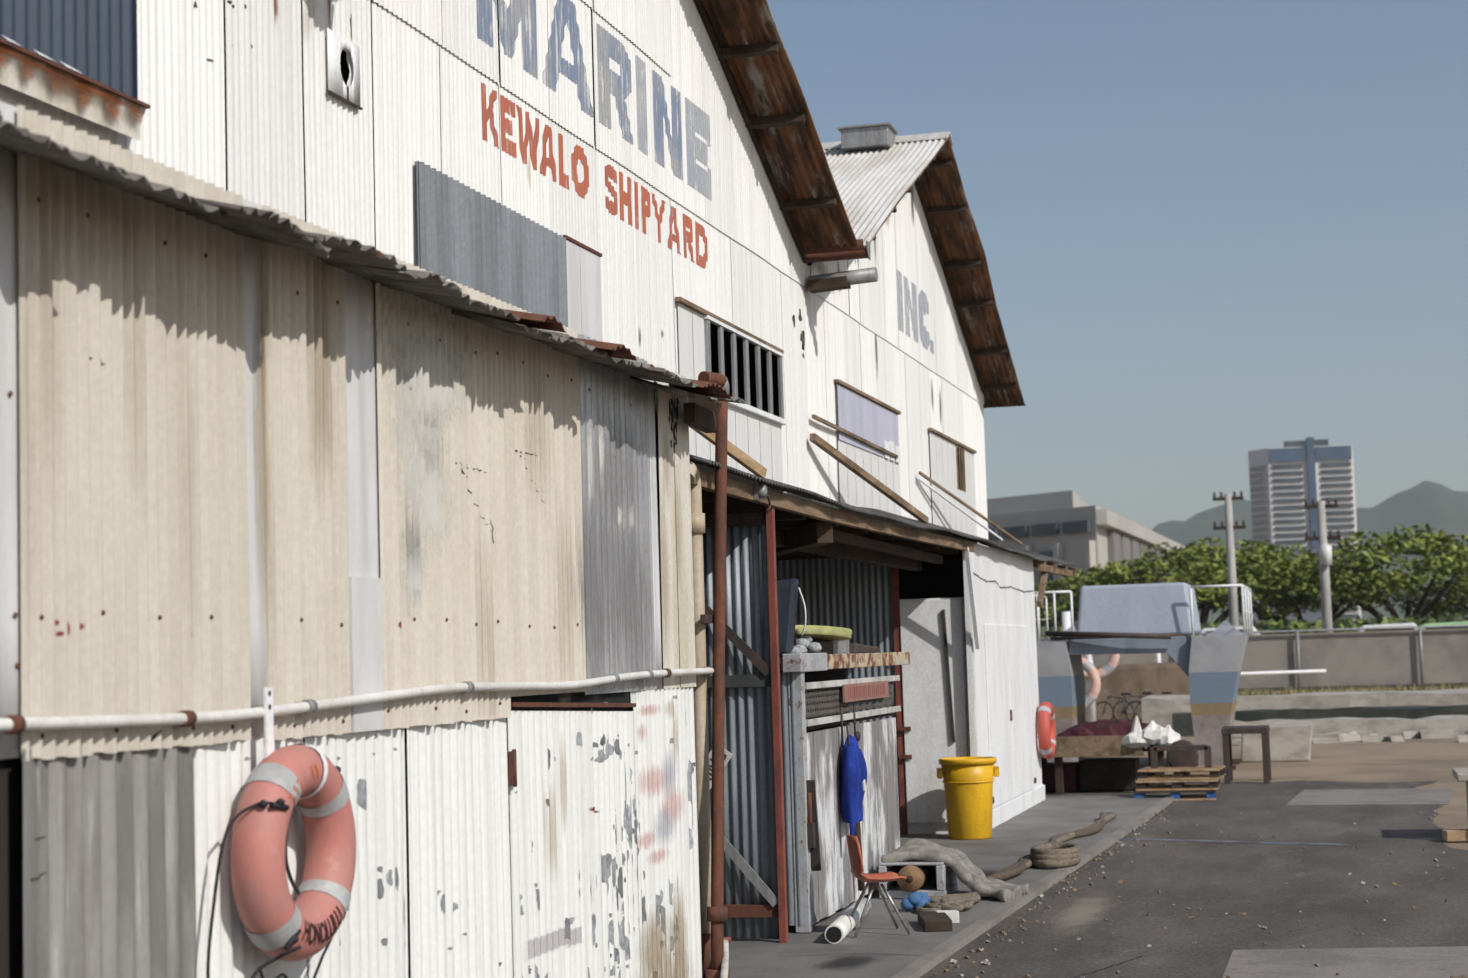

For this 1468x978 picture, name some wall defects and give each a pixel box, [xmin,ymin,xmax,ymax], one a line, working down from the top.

rust [0,44,142,121]
water stain [390,306,466,604]
water stain [581,423,604,500]
peeling [357,779,367,810]
peeling [687,760,697,850]
peeling [565,732,679,978]
peeling [377,866,405,925]
peeling [437,890,458,914]
peeling [520,883,540,915]